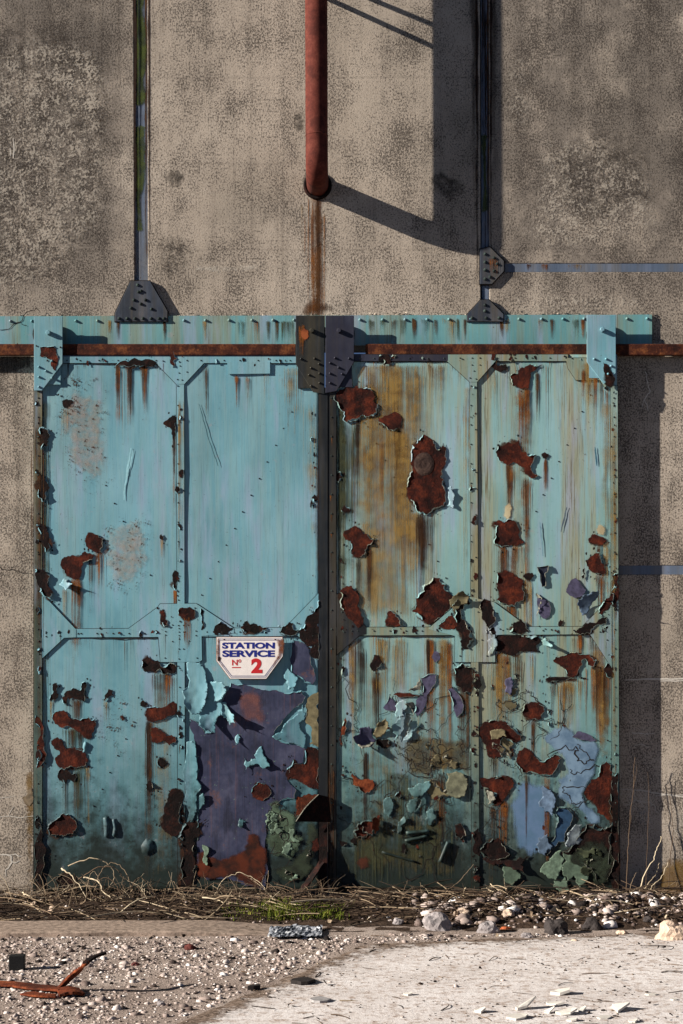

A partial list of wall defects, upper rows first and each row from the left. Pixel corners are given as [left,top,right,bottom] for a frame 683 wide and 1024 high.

corrosion [257,199,327,340]
corrosion [36,345,165,486]
corrosion [330,360,621,890]
corrosion [34,655,207,894]
peeling [176,630,318,890]
peeling [353,651,440,749]
peeling [502,864,522,886]
peeling [535,786,589,891]
peeling [531,709,617,744]